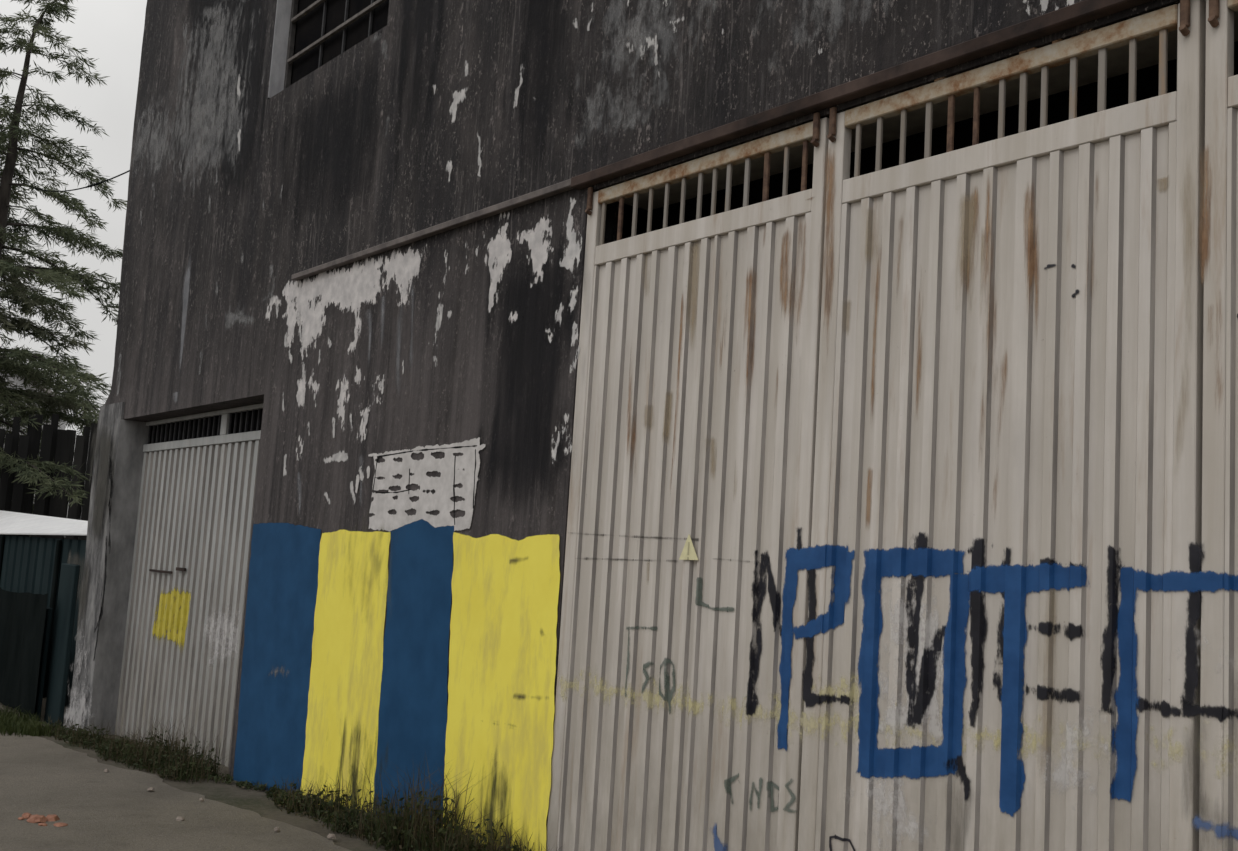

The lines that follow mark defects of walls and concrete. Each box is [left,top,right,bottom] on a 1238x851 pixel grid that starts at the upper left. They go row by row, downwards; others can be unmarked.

water stain [133,0,266,184]
peeling [449,60,468,123]
water stain [180,267,190,362]
peeling [225,244,427,504]
peeling [433,250,452,367]
peeling [465,198,582,373]
corrosion [823,157,834,315]
corrosion [871,269,879,410]
corrosion [961,189,990,287]
corrosion [1025,192,1038,308]
peeling [551,413,572,464]
water stain [67,553,89,632]